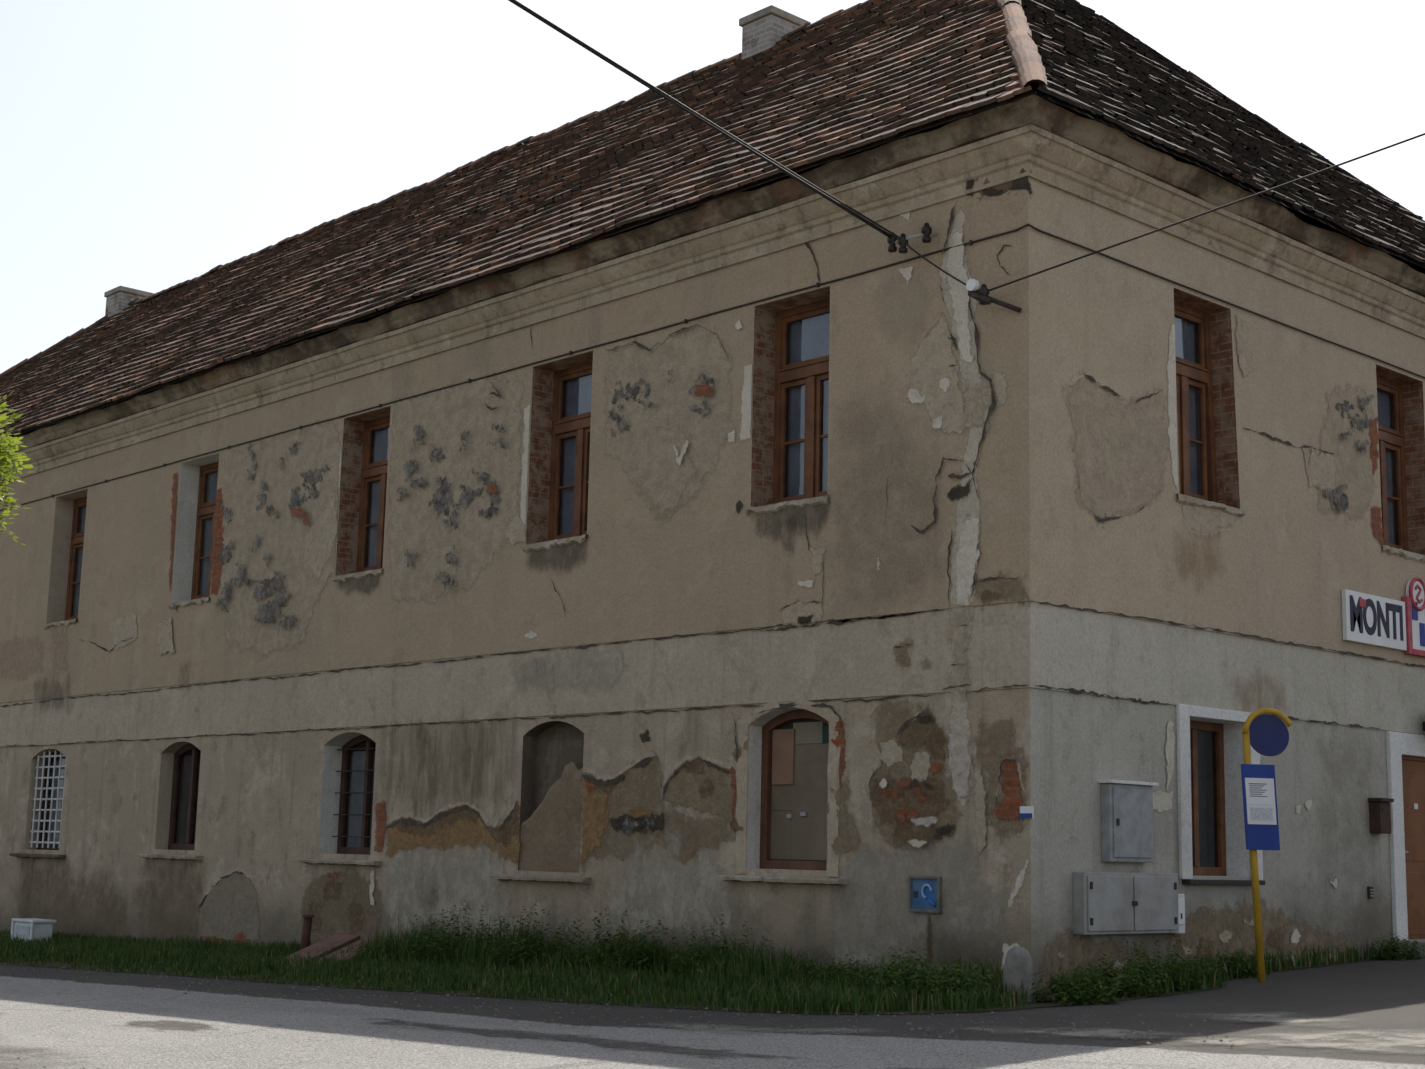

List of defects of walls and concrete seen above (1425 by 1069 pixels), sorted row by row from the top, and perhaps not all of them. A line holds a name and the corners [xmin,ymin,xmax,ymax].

spalling [157,472,177,656]
spalling [211,421,341,660]
peeling [504,405,530,545]
crack [1,200,1169,806]
peeling [603,320,752,520]
peeling [903,309,967,435]
peeling [1166,324,1178,489]
spalling [1318,384,1384,545]
spalling [580,700,1029,872]
crack [1274,715,1379,729]
peeling [1001,943,1020,969]
peeling [1008,859,1029,908]